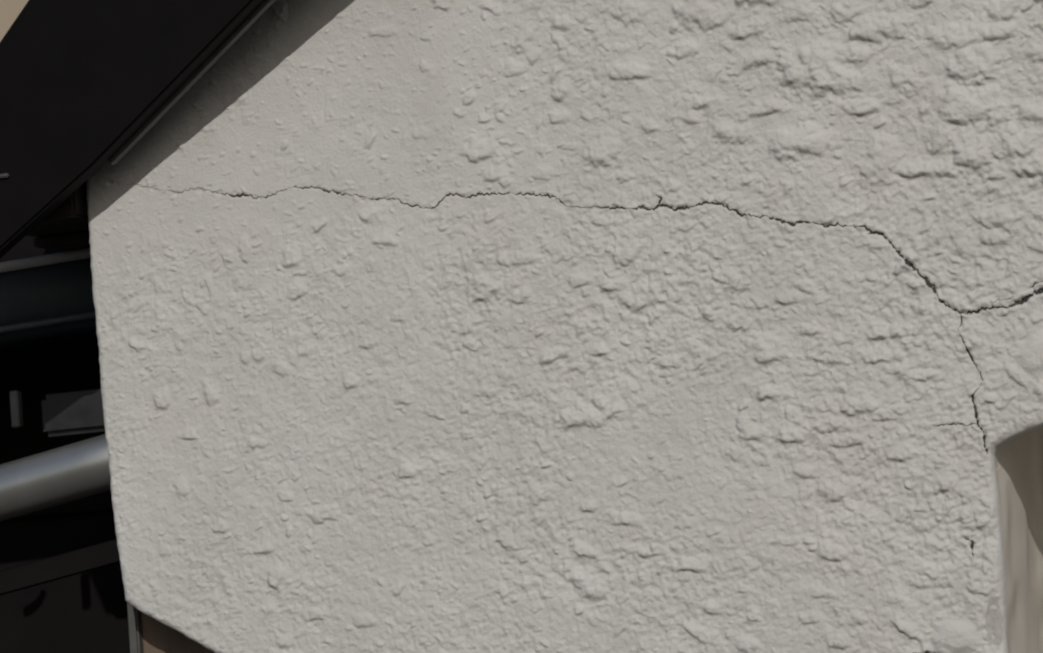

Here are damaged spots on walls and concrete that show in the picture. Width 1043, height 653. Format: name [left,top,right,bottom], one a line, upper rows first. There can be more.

crack [114,181,1043,454]